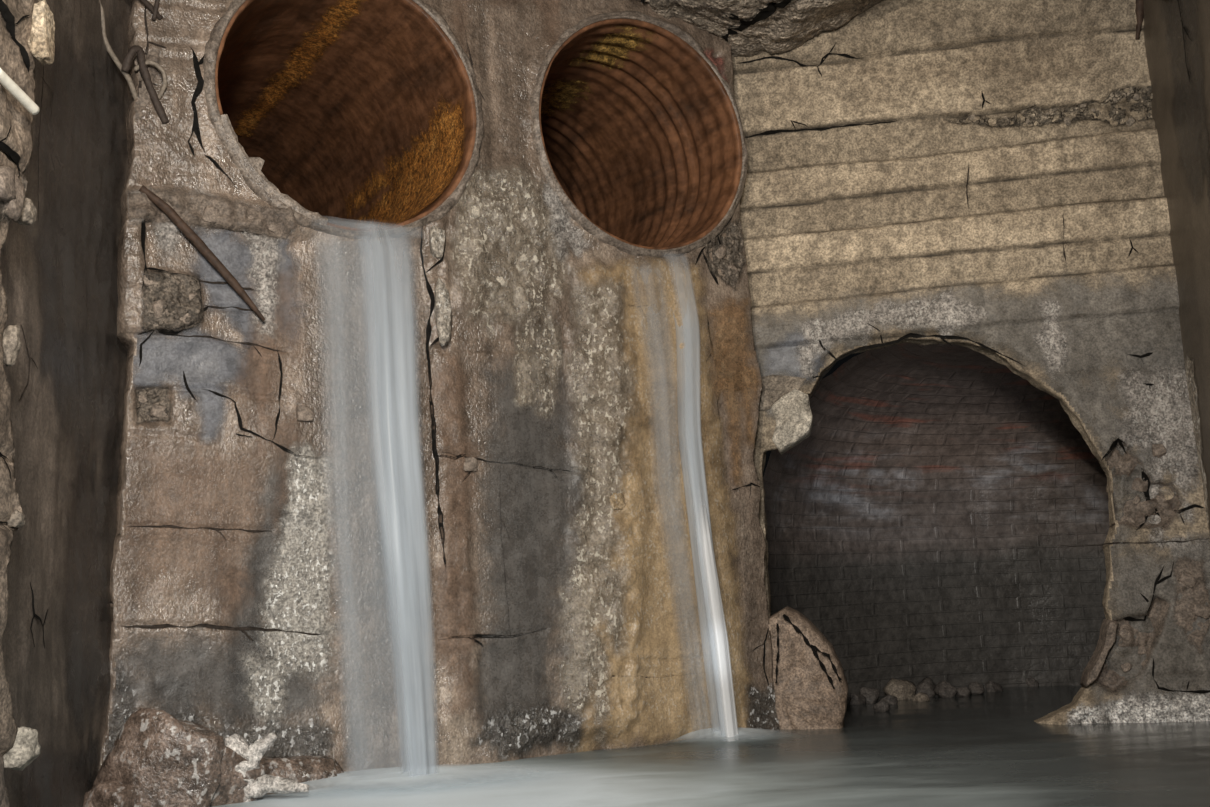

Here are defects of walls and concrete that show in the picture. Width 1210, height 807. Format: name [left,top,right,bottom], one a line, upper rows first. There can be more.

crack [138,6,237,188]
corrosion [234,0,360,137]
corrosion [346,102,465,228]
corrosion [541,26,653,116]
spalling [946,86,1154,128]
leakage [22,45,337,807]
crack [138,218,316,458]
crack [420,226,578,583]
corrosion [576,259,750,752]
spalling [1107,444,1182,529]
spalling [1096,598,1169,693]